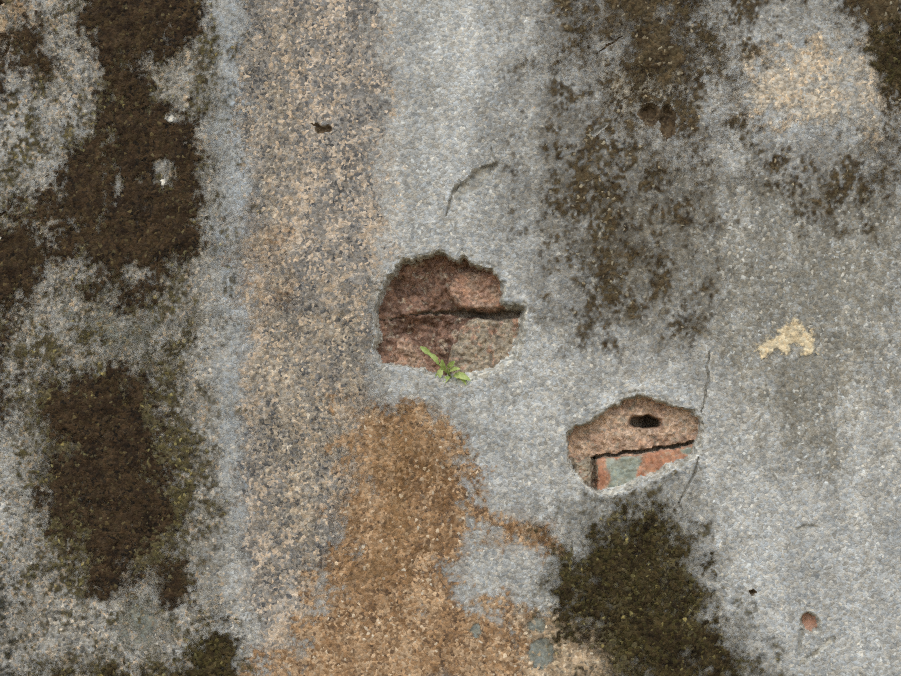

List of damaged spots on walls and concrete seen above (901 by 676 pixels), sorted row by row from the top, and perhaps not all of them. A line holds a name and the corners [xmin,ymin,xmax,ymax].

leakage [518,0,901,353]
leakage [0,0,400,676]
spalling [373,250,540,398]
spalling [566,393,704,496]
crack [679,456,700,503]
crack [701,350,711,412]